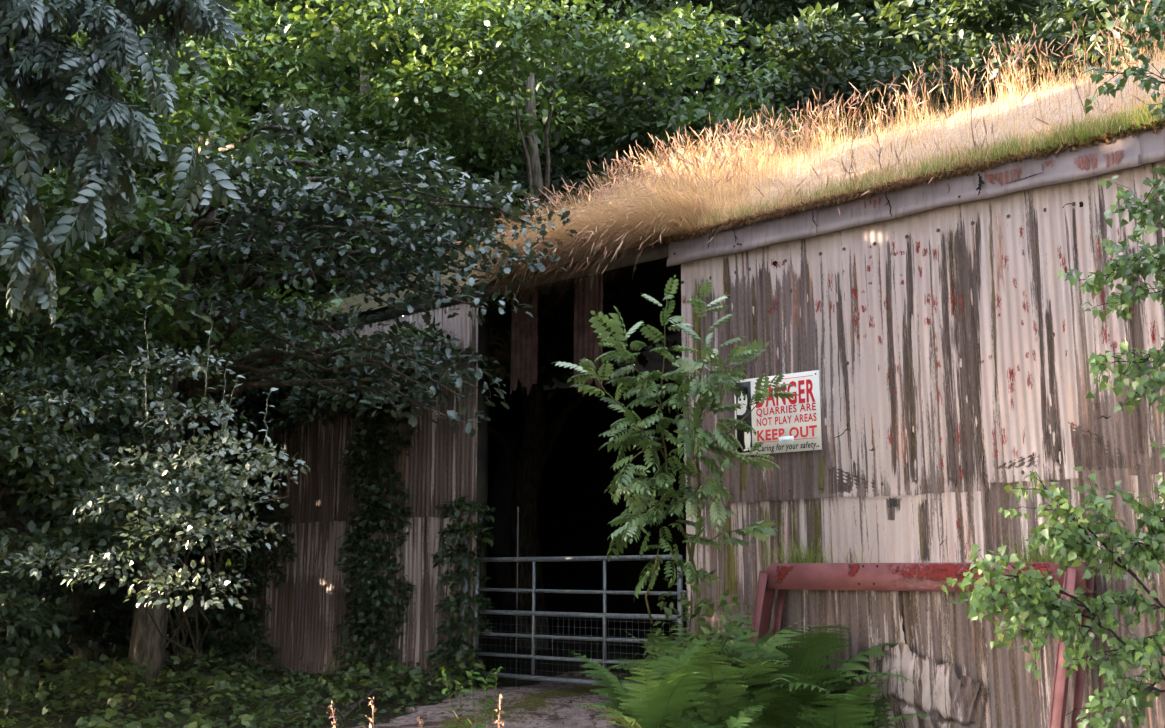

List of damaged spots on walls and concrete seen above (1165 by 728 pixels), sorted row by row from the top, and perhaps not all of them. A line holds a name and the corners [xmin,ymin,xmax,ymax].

corrosion [1073,150,1124,171]
corrosion [891,241,937,277]
corrosion [924,286,965,368]
corrosion [998,227,1038,411]
damp [940,204,1151,561]